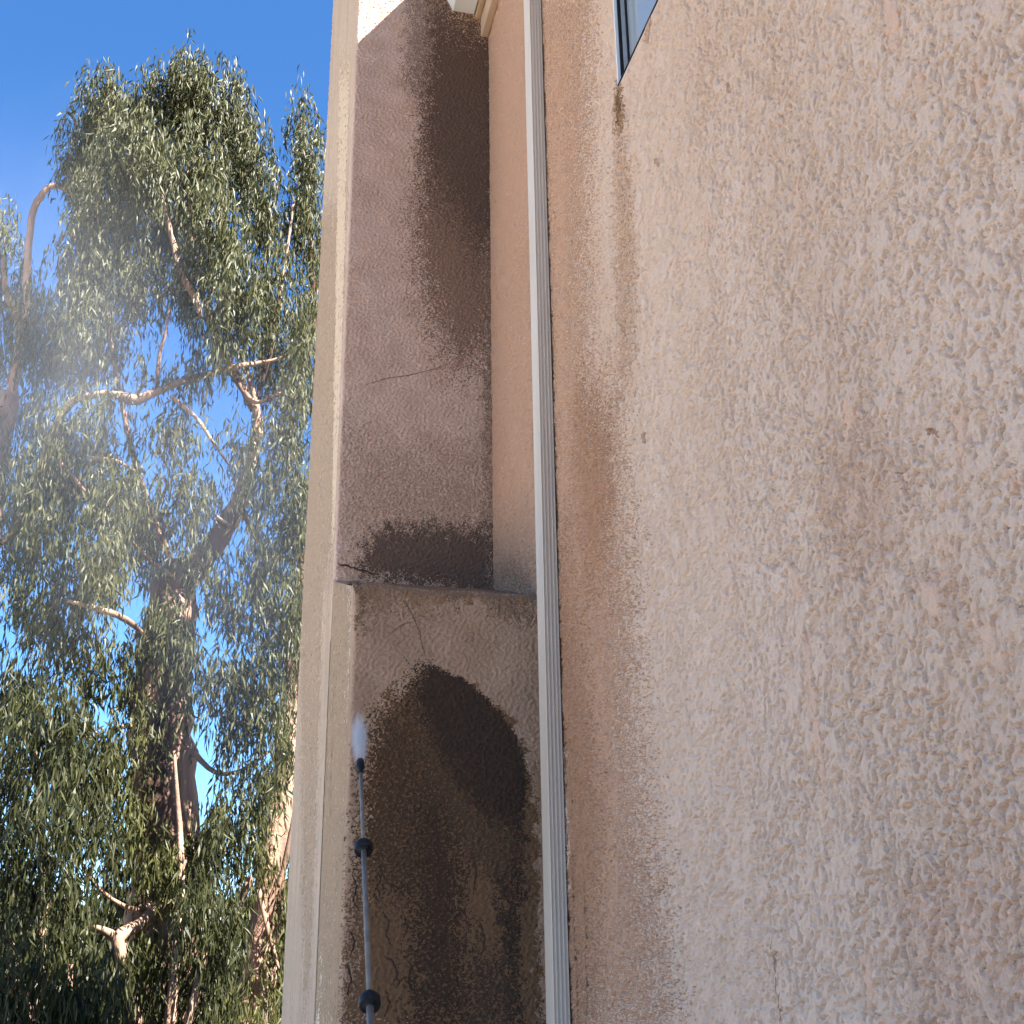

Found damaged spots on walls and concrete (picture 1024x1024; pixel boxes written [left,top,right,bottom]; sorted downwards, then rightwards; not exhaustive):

damp [563,752,572,900]